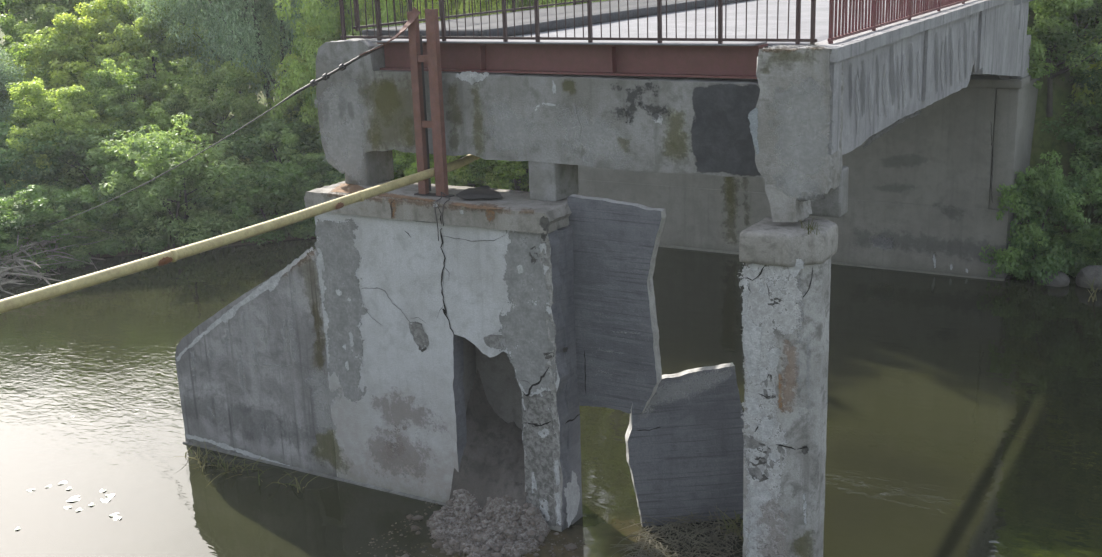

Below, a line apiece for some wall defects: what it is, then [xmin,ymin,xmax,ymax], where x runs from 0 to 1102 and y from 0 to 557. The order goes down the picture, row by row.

peeling [176,219,367,403]
crack [362,203,503,334]
peeling [484,216,580,528]
crack [521,351,586,426]
peeling [737,259,809,557]
rust [778,340,799,413]